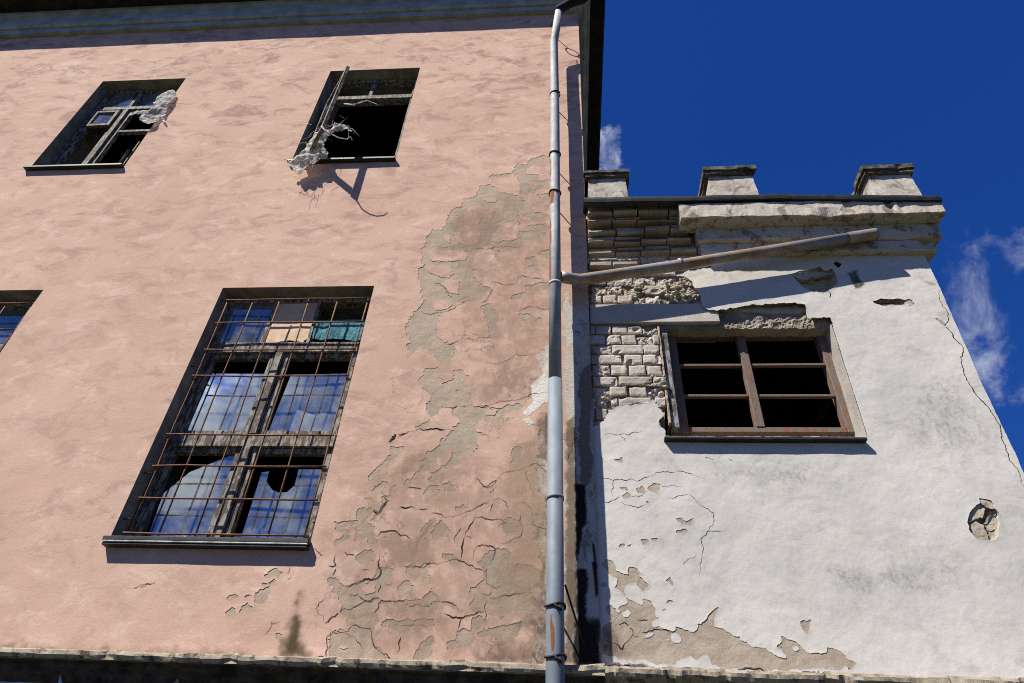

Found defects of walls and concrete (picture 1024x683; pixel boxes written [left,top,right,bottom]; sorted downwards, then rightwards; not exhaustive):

spalling [225,568,282,617]
flaking render [327,155,550,664]
crack [315,437,578,658]
crack [601,457,732,574]
flaking render [563,206,856,671]
crack [938,291,1024,487]
spalling [967,498,999,541]